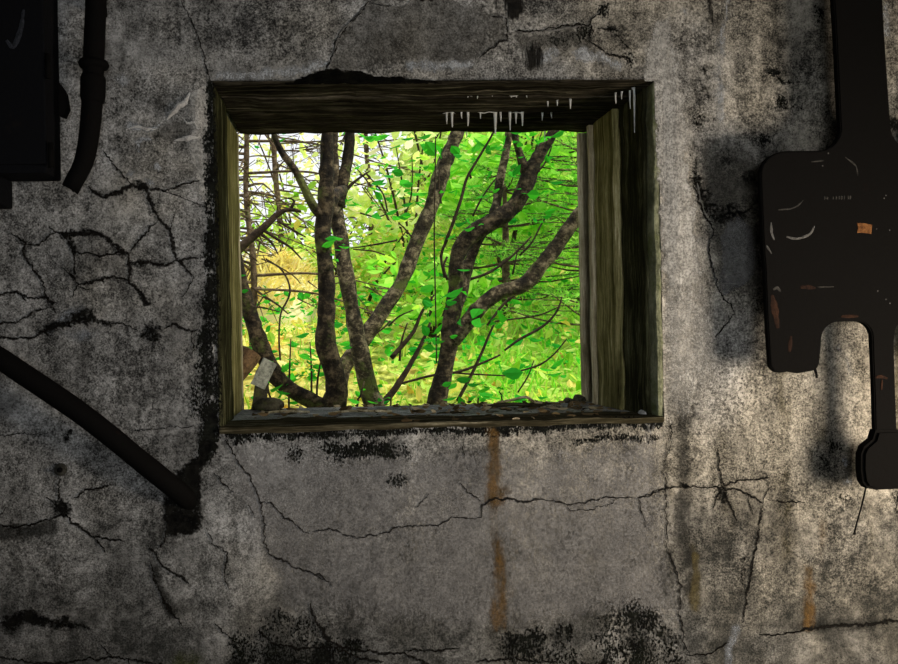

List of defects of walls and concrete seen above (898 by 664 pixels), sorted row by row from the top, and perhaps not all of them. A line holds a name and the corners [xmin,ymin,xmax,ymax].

water stain [495,0,523,21]
crack [480,7,632,63]
crack [0,150,202,340]
water stain [162,60,664,538]
crack [693,181,735,338]
crack [0,476,125,552]
crack [147,533,189,626]
corrosion [488,428,502,505]
crack [214,421,898,664]
water stain [669,411,700,611]
mould [226,607,369,664]
mould [496,597,707,664]